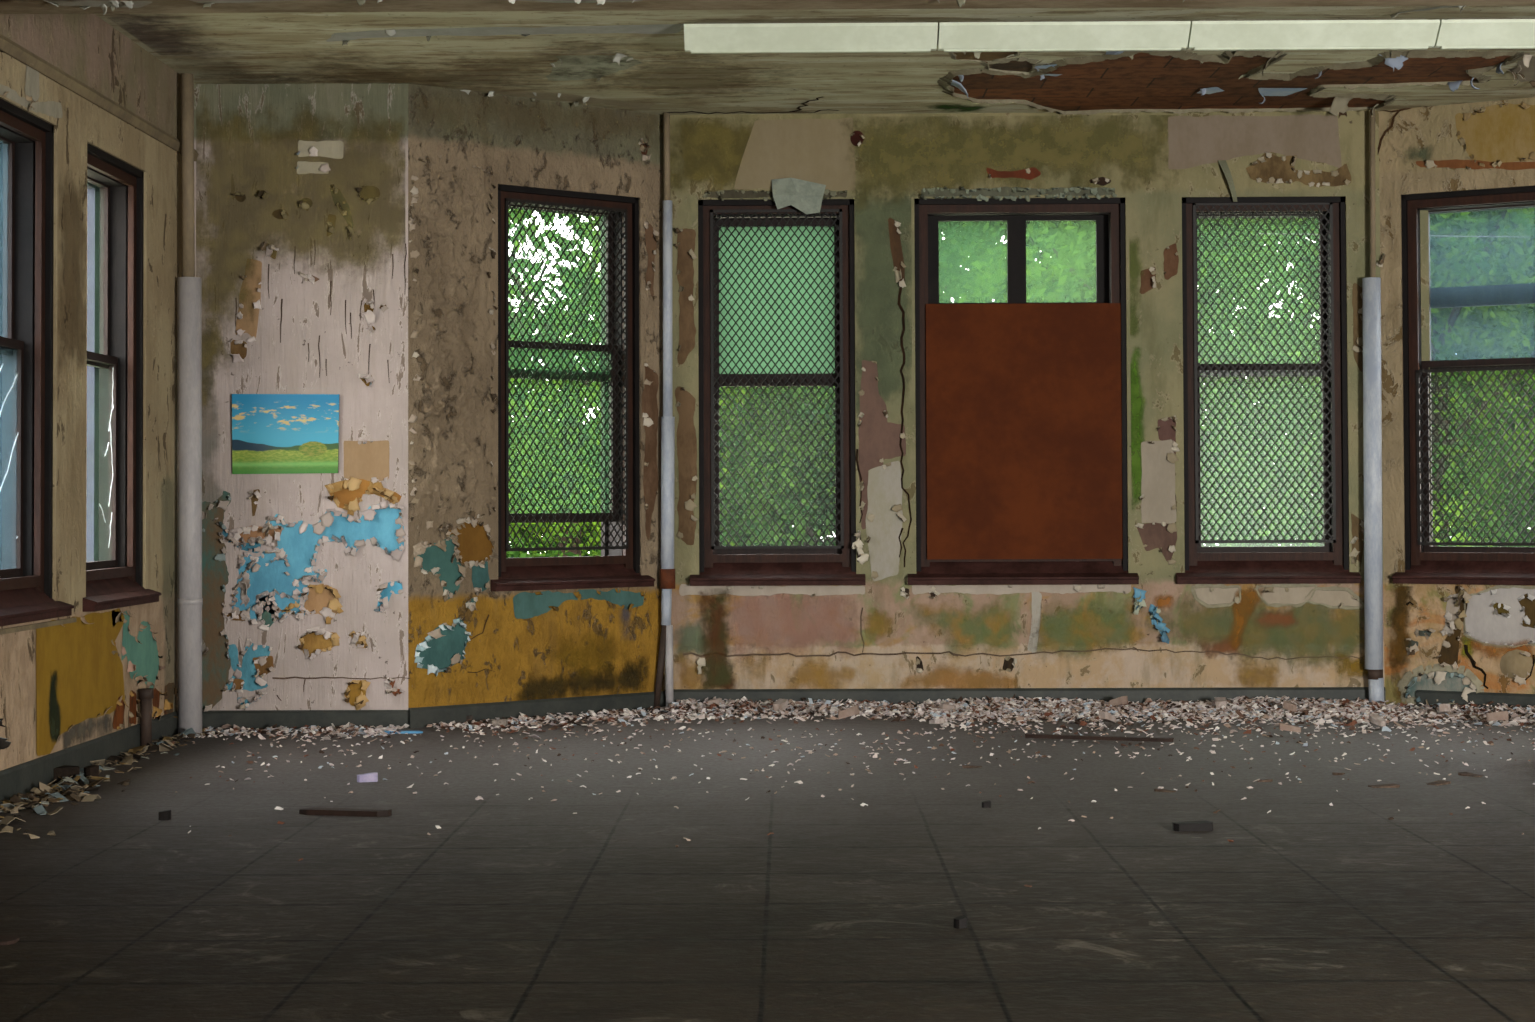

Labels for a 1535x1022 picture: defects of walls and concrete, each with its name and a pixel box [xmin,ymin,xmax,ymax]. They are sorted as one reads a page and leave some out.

damp [196,109,405,401]
damp [855,115,1171,396]
peeling [0,718,11,750]
peeling [202,140,498,712]
peeling [679,360,1170,674]
peeling [1397,585,1535,705]